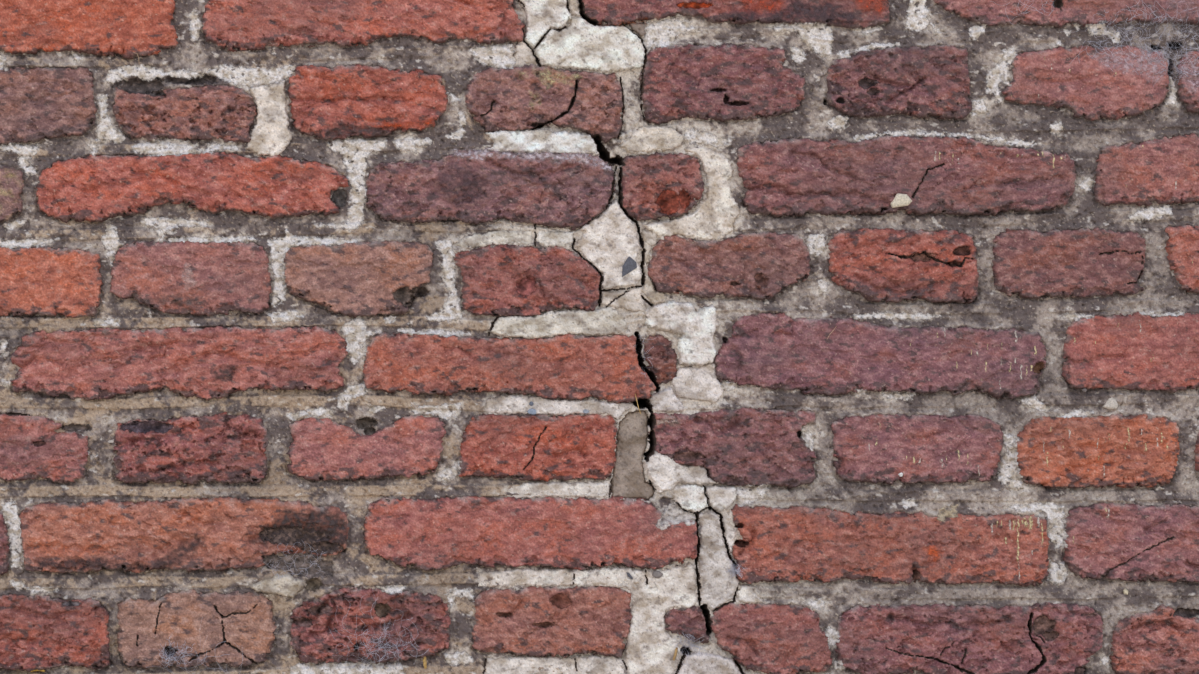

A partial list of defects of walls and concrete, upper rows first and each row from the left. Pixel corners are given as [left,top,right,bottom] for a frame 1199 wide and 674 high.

crack [518,0,740,674]
crack [1105,536,1174,576]
crack [136,603,162,646]
crack [189,604,257,663]
crack [886,642,975,674]
crack [1027,612,1047,674]